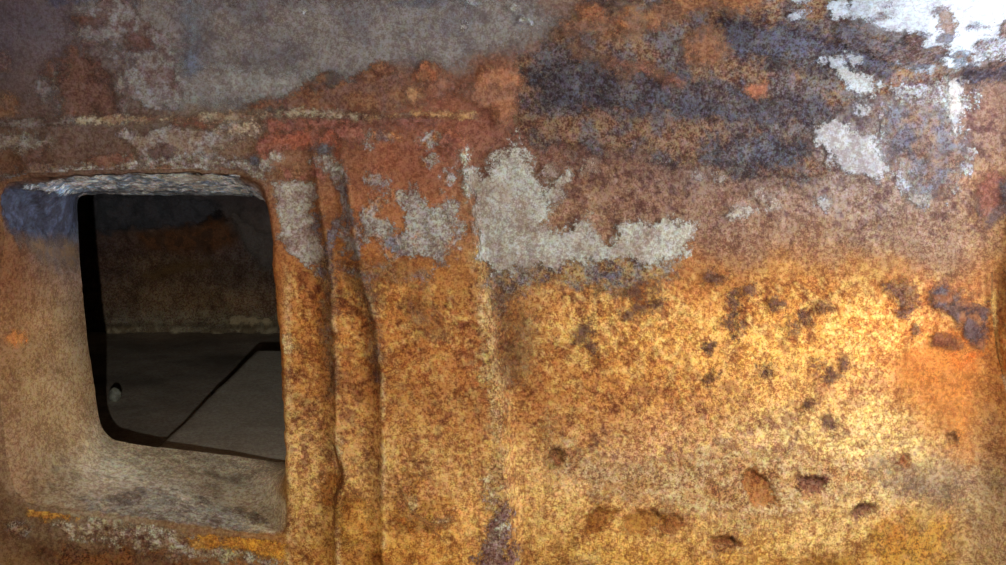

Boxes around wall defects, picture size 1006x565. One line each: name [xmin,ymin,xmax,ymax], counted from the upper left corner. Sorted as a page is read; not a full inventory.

leakage [0,0,1006,194]
crack [332,446,361,526]